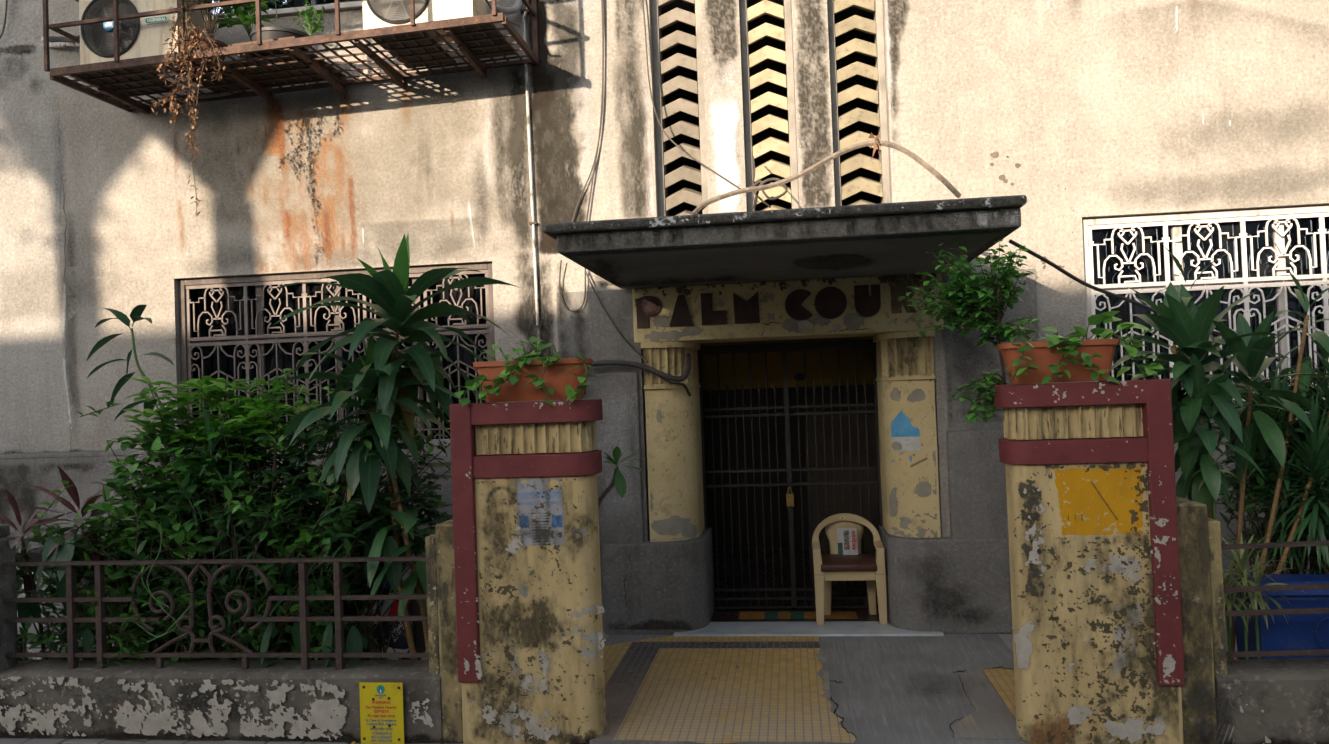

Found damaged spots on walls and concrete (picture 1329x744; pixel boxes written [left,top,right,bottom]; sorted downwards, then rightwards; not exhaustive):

rust [285,137,354,260]
damp [435,196,485,255]
damp [485,0,1024,358]
peeling [505,526,523,555]
peeling [1023,485,1046,576]
peeling [1083,515,1178,677]
peeling [0,676,348,741]
peeling [409,698,433,727]
peeling [464,640,560,743]
peeling [1012,621,1040,673]
peeling [1067,706,1167,744]
peeling [1153,633,1264,744]